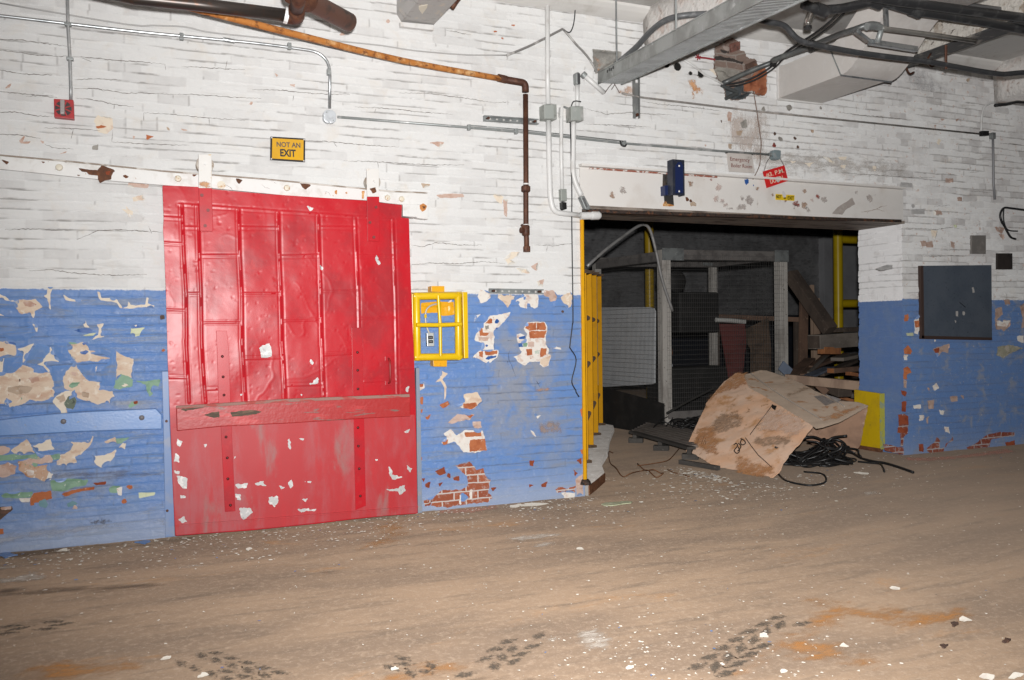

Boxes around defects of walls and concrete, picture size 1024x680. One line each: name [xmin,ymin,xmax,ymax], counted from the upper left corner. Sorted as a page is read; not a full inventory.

spalling [664,38,767,149]
peeling [0,287,160,413]
peeling [933,344,950,357]
peeling [995,299,1024,358]
flaking render [967,432,1015,458]
flaking render [0,370,614,594]
peeling [605,463,870,518]
peeling [578,608,788,679]